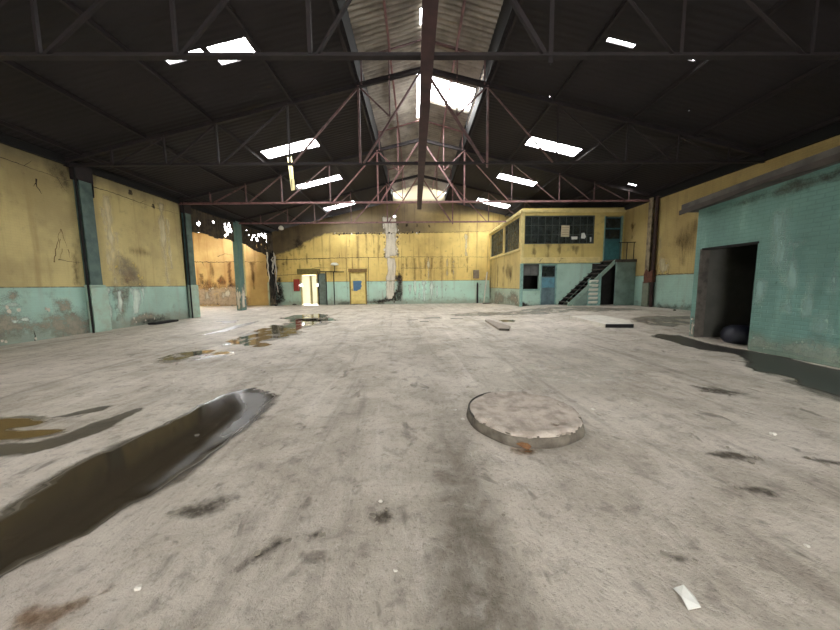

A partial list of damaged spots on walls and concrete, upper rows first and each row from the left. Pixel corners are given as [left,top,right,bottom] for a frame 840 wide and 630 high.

crack [54,229,79,263]
peeling [383,215,402,303]
peeling [0,292,89,343]
peeling [198,285,248,309]